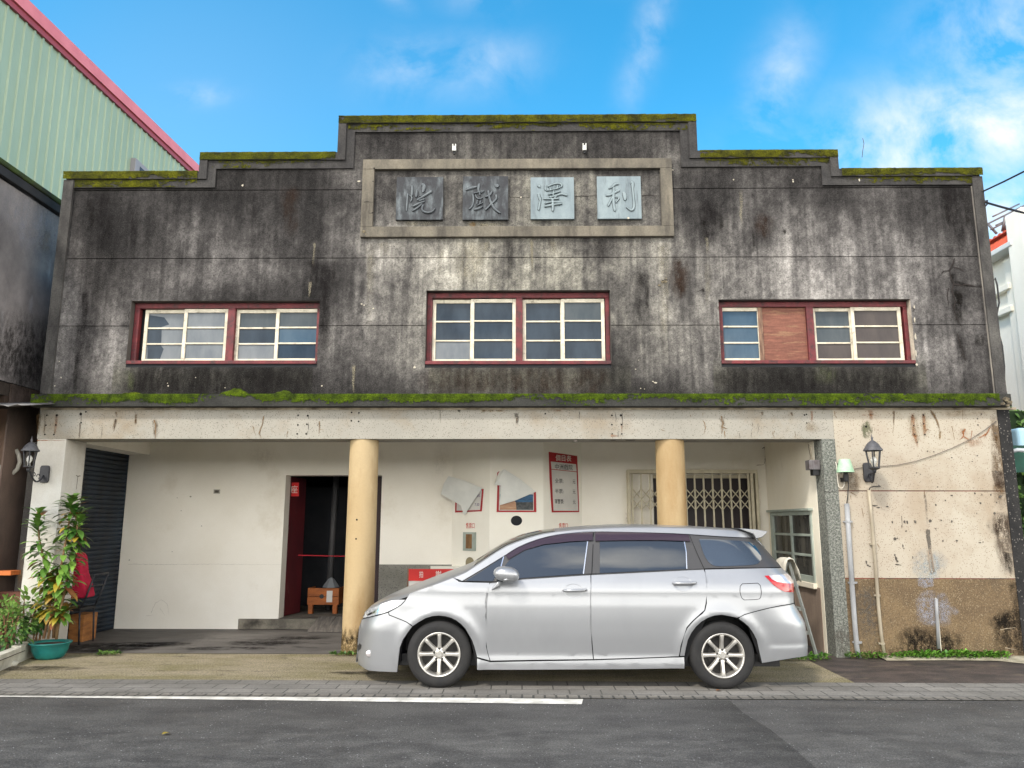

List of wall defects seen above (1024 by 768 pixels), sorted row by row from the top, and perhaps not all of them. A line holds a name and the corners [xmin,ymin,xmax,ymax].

leakage [995,516,1012,569]
leakage [906,631,953,651]
leakage [996,585,1023,654]